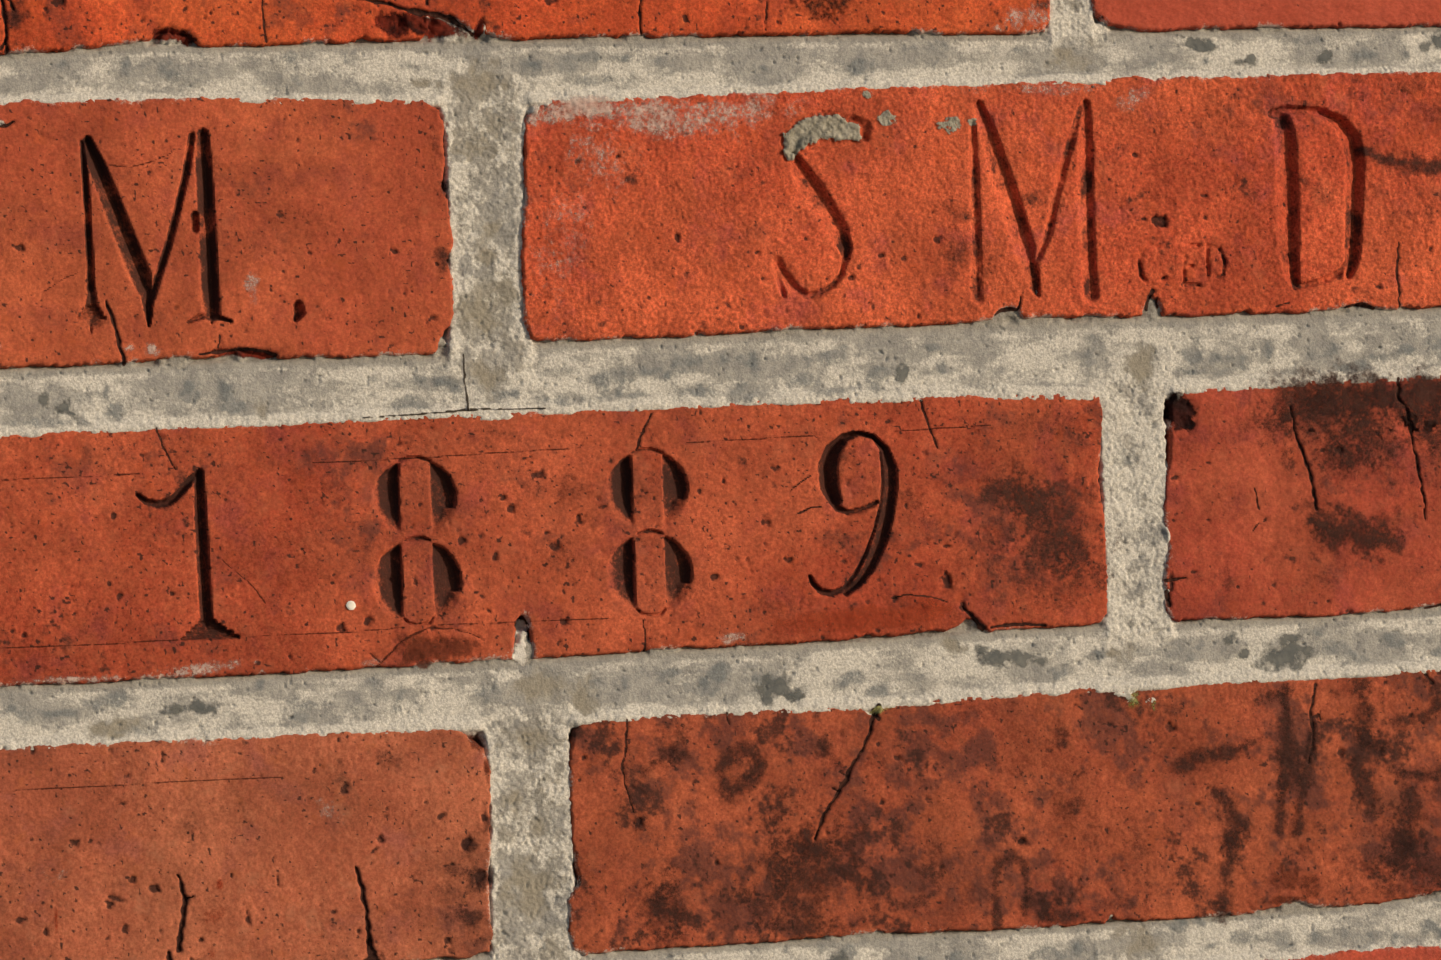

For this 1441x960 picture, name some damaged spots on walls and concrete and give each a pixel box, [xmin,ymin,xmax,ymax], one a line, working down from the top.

crack [0,0,15,54]
crack [365,0,474,37]
spalling [1163,392,1197,431]
crack [1290,406,1318,511]
water stain [982,479,1096,579]
crack [814,703,882,840]
water stain [1175,739,1257,774]
water stain [1225,634,1317,836]
water stain [1350,678,1441,895]
water stain [1211,788,1250,925]
crack [166,874,194,960]
crack [355,866,380,960]